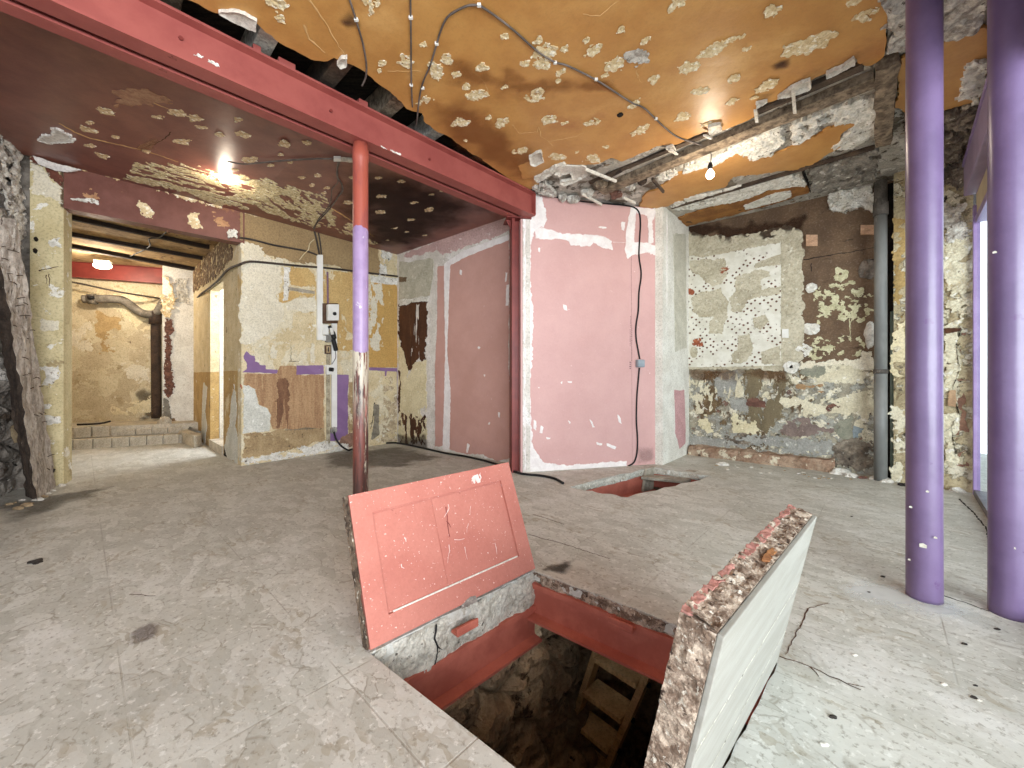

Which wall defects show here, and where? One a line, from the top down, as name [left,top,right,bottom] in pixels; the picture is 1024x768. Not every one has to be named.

spalling [427,53,508,101]
spalling [582,36,651,78]
spalling [656,94,881,211]
peeling [106,139,353,359]
peeling [368,219,429,443]
spalling [689,238,782,334]
spalling [689,267,874,472]
spalling [943,58,987,468]
spalling [224,382,353,465]
crack [959,499,987,535]
crack [434,624,442,665]
crack [779,603,863,690]